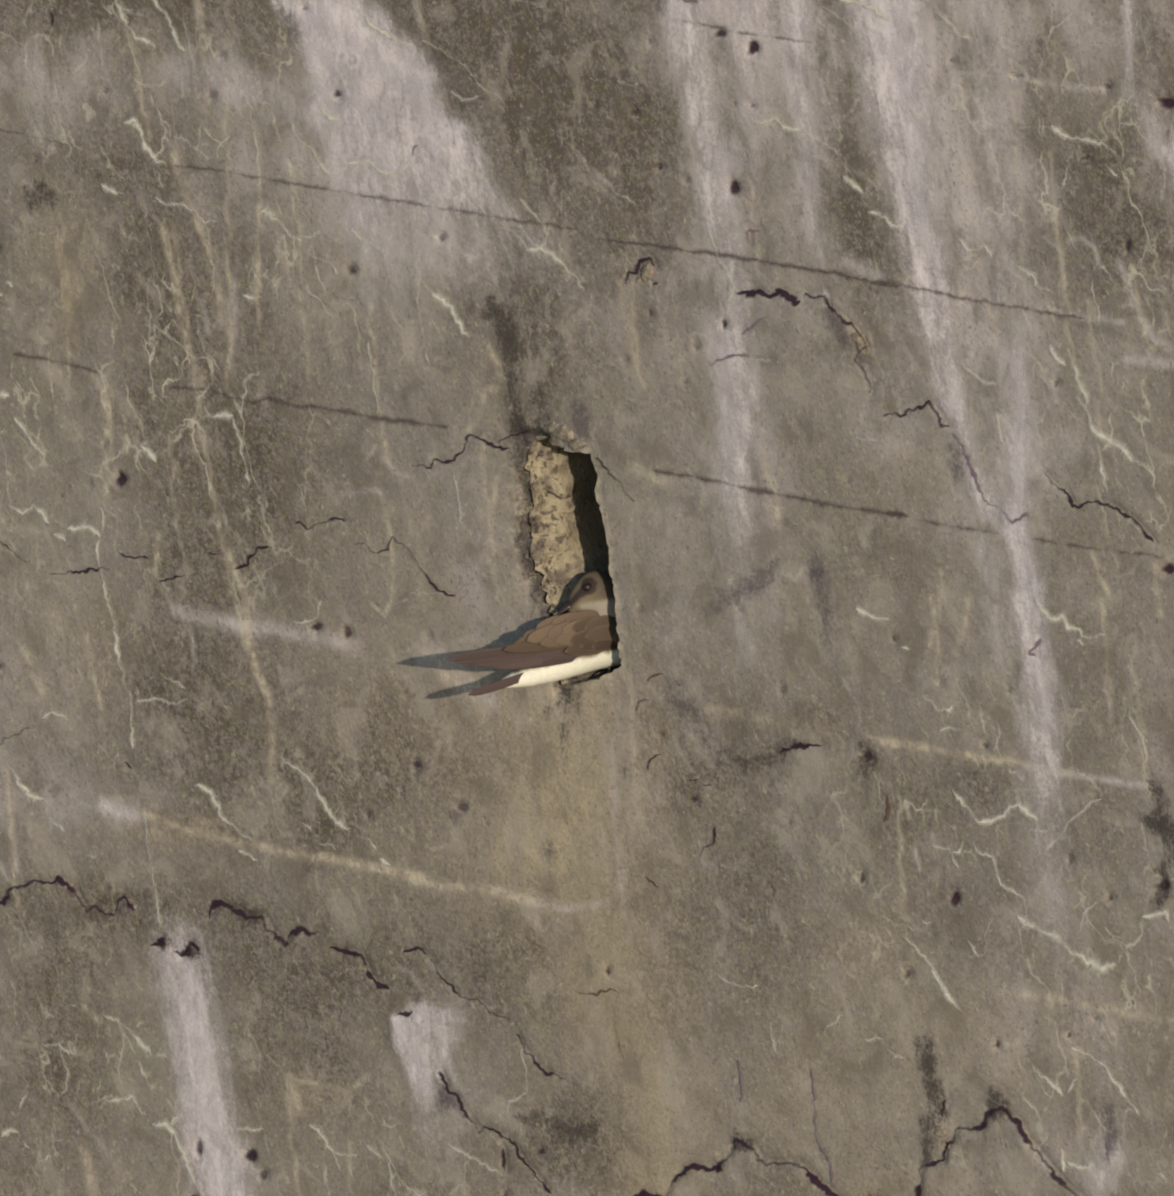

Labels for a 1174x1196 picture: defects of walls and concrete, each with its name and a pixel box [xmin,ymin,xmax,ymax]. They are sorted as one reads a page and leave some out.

leakage [273,0,504,261]
crack [709,230,871,386]
spalling [548,421,587,451]
leakage [849,0,1059,804]
crack [1045,346,1153,542]
crack [0,875,201,957]
crack [209,900,412,1017]
leakage [160,928,251,1196]
leakage [391,1002,463,1112]
crack [439,1072,552,1194]
crack [634,1069,839,1196]
crack [915,1047,1138,1196]